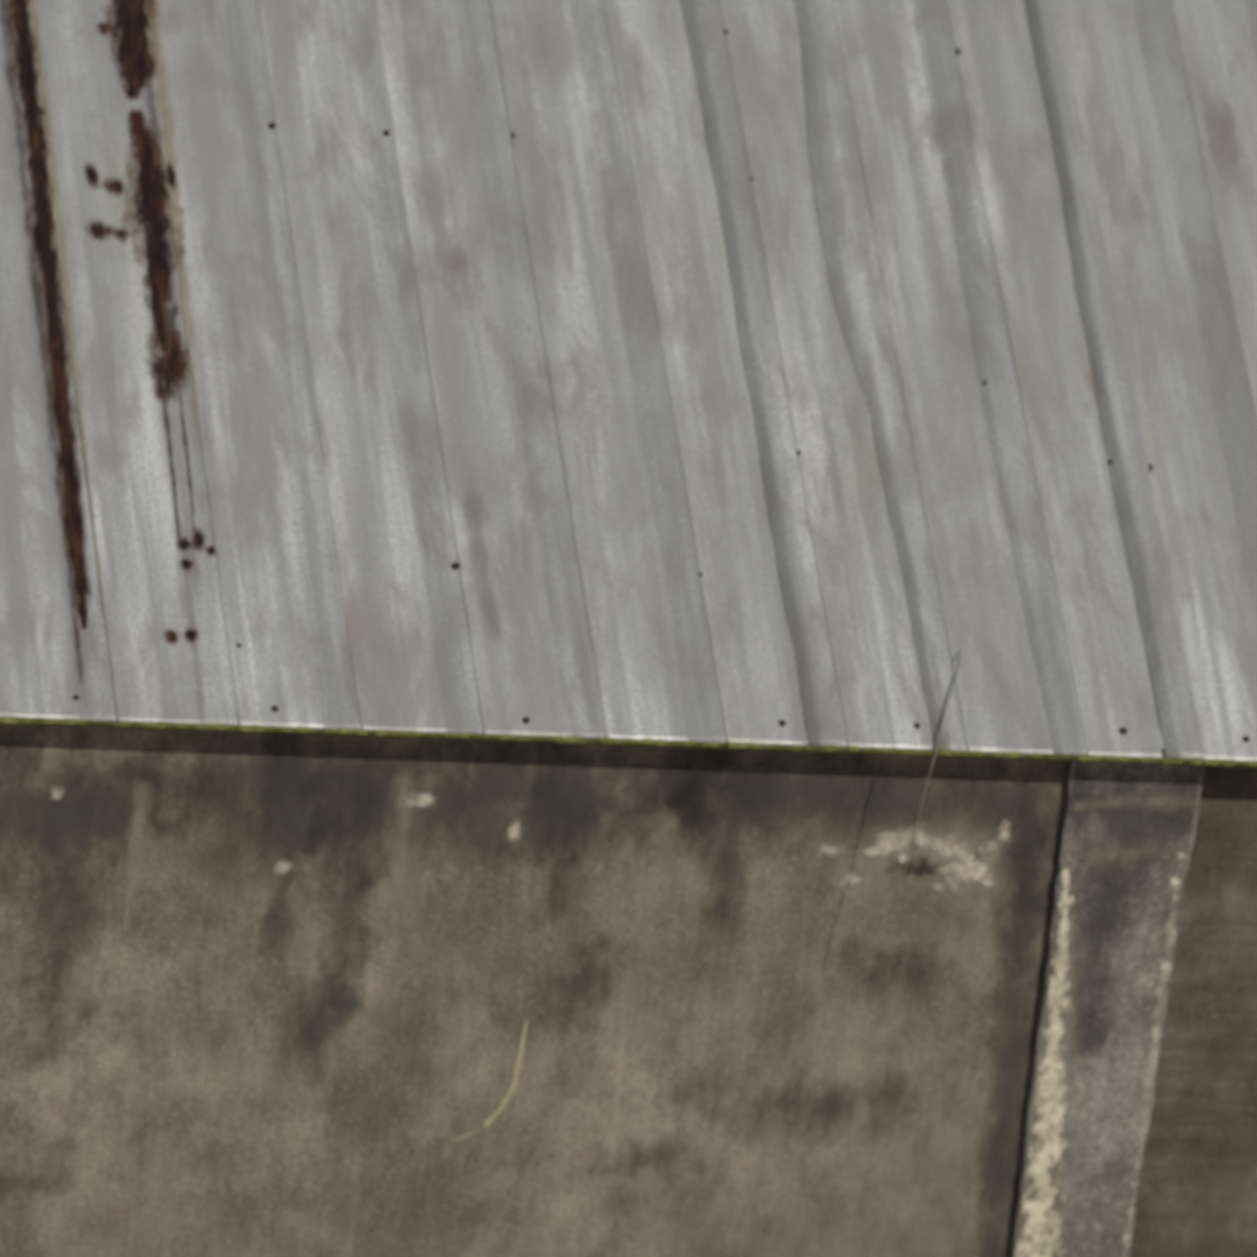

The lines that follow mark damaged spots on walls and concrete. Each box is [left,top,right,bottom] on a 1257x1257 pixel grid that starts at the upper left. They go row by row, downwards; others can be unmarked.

rust [2,0,90,650]
rust [85,0,215,569]
water stain [0,764,159,931]
rust [166,629,197,643]
water stain [197,741,1041,1210]
water stain [1070,770,1196,939]